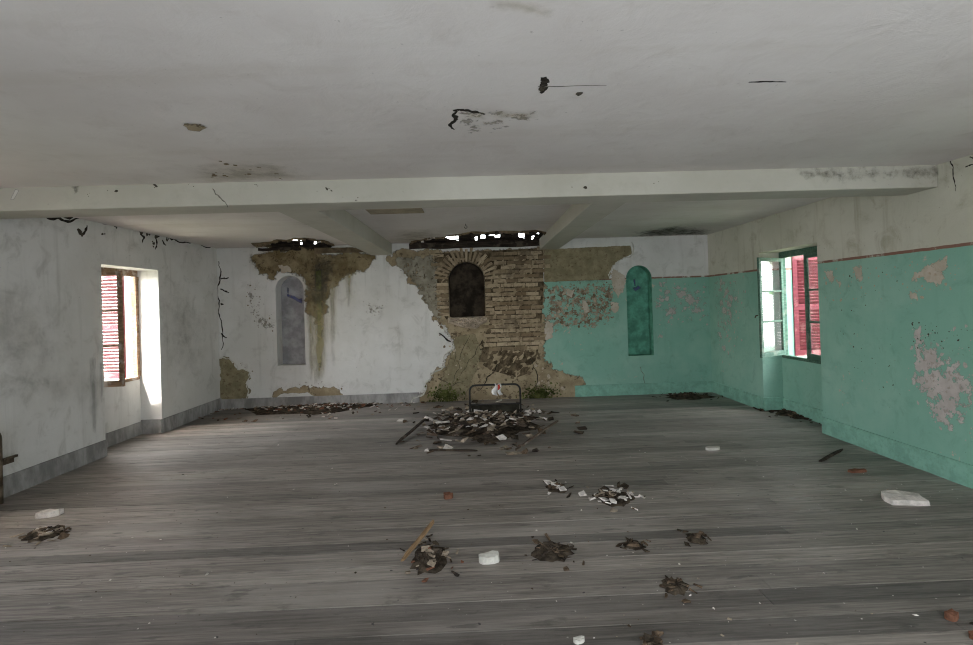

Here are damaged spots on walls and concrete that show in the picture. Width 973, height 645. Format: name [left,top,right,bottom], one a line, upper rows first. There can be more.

peeling [448,109,534,133]
crack [950,156,973,191]
crack [47,217,117,237]
crack [140,232,229,350]
peeling [902,256,959,304]
flaking render [386,242,634,403]
flaking render [219,356,253,399]
peeling [905,322,973,441]